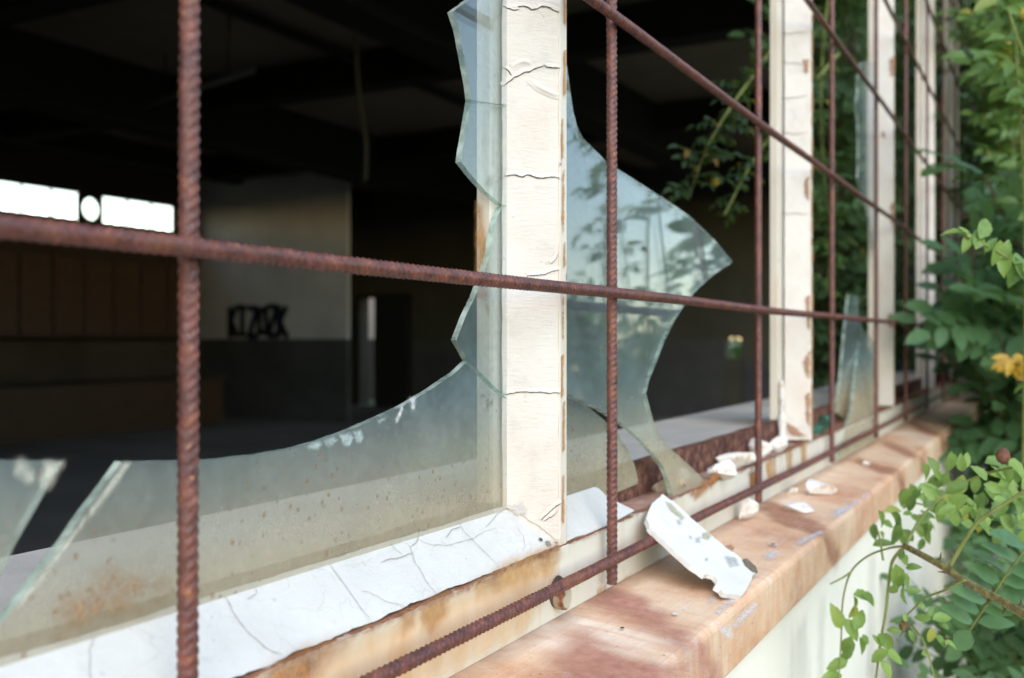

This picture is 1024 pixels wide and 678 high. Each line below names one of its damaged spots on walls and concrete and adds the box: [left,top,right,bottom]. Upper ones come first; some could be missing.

crack [503,2,560,12]
crack [500,61,560,86]
crack [505,170,559,179]
crack [526,251,559,276]
corrosion [621,471,720,512]
crack [383,499,562,595]
crack [329,564,407,617]
crack [223,586,280,654]
corrosion [307,548,560,678]